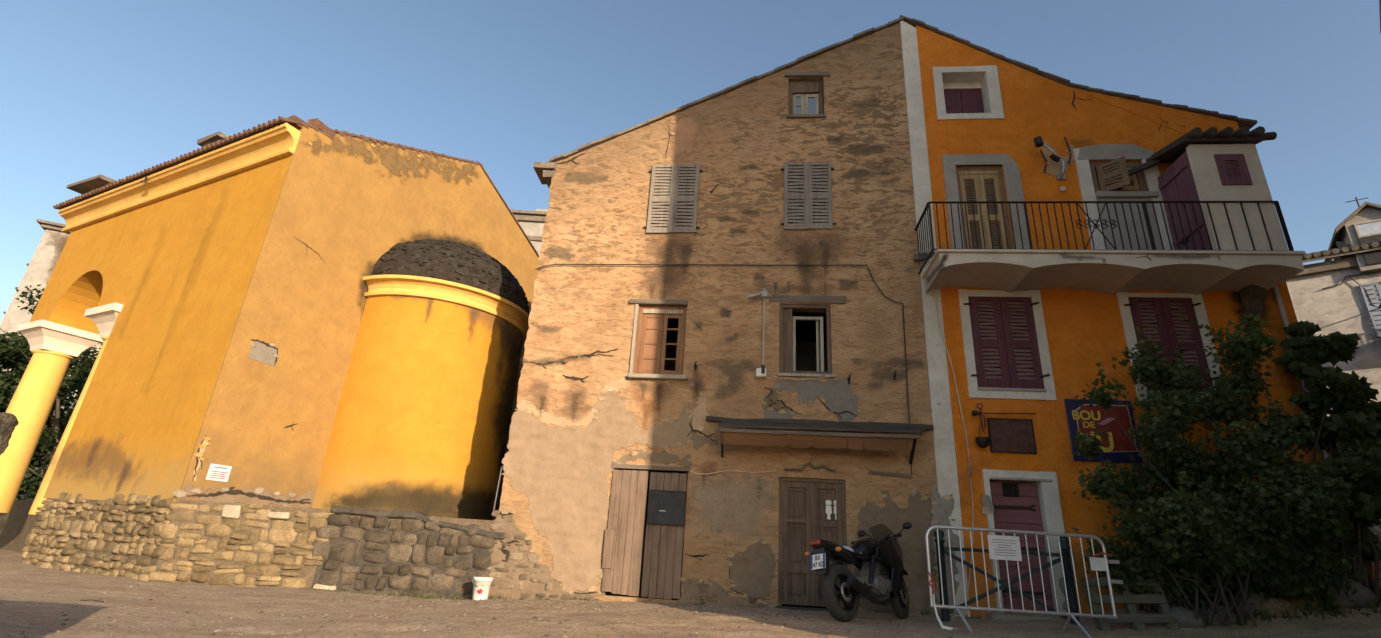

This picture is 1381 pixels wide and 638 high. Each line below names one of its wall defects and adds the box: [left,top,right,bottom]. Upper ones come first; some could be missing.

crack [522,349,618,383]
spalling [761,377,860,422]
leakage [332,484,499,520]
peeling [487,374,717,601]